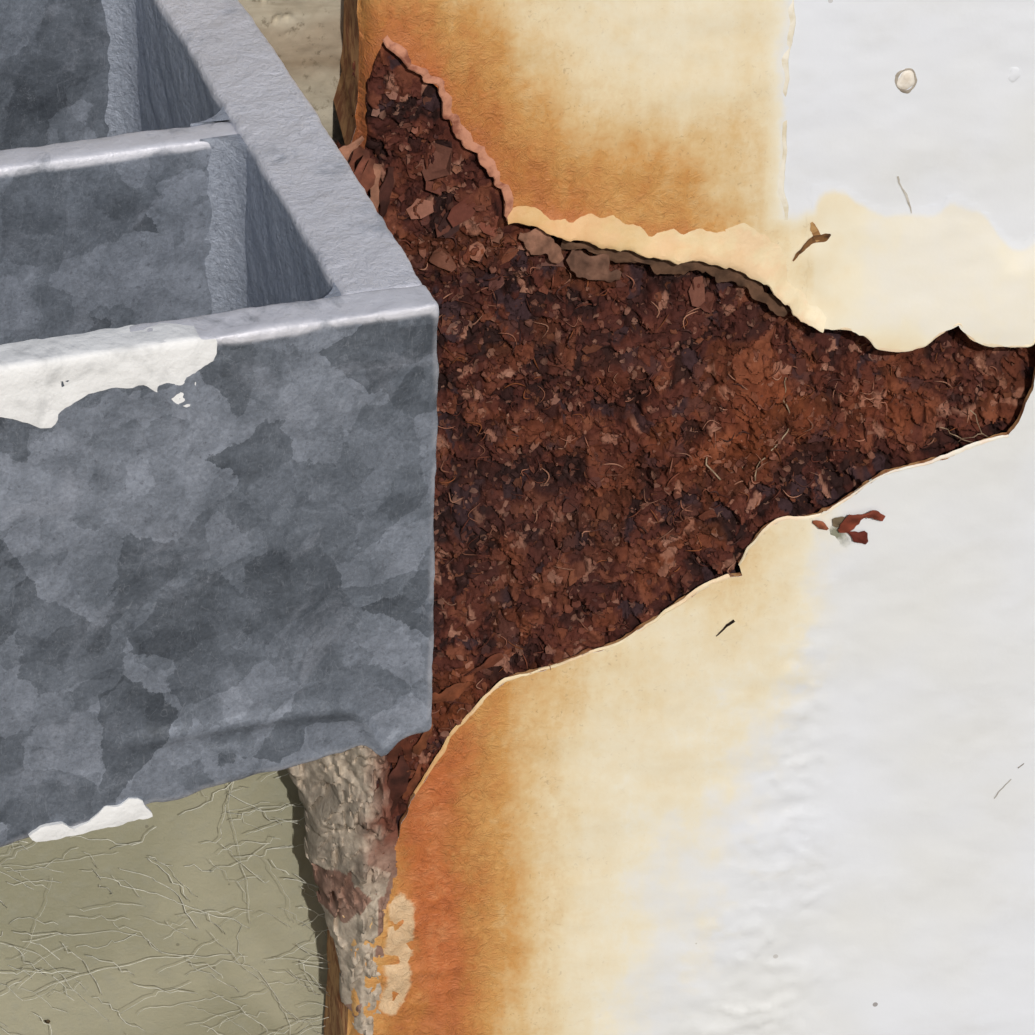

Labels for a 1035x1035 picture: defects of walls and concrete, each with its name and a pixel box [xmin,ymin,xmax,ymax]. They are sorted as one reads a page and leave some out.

corrosion [351,0,937,294]
spalling [334,35,1035,833]
peeling [376,885,420,1021]